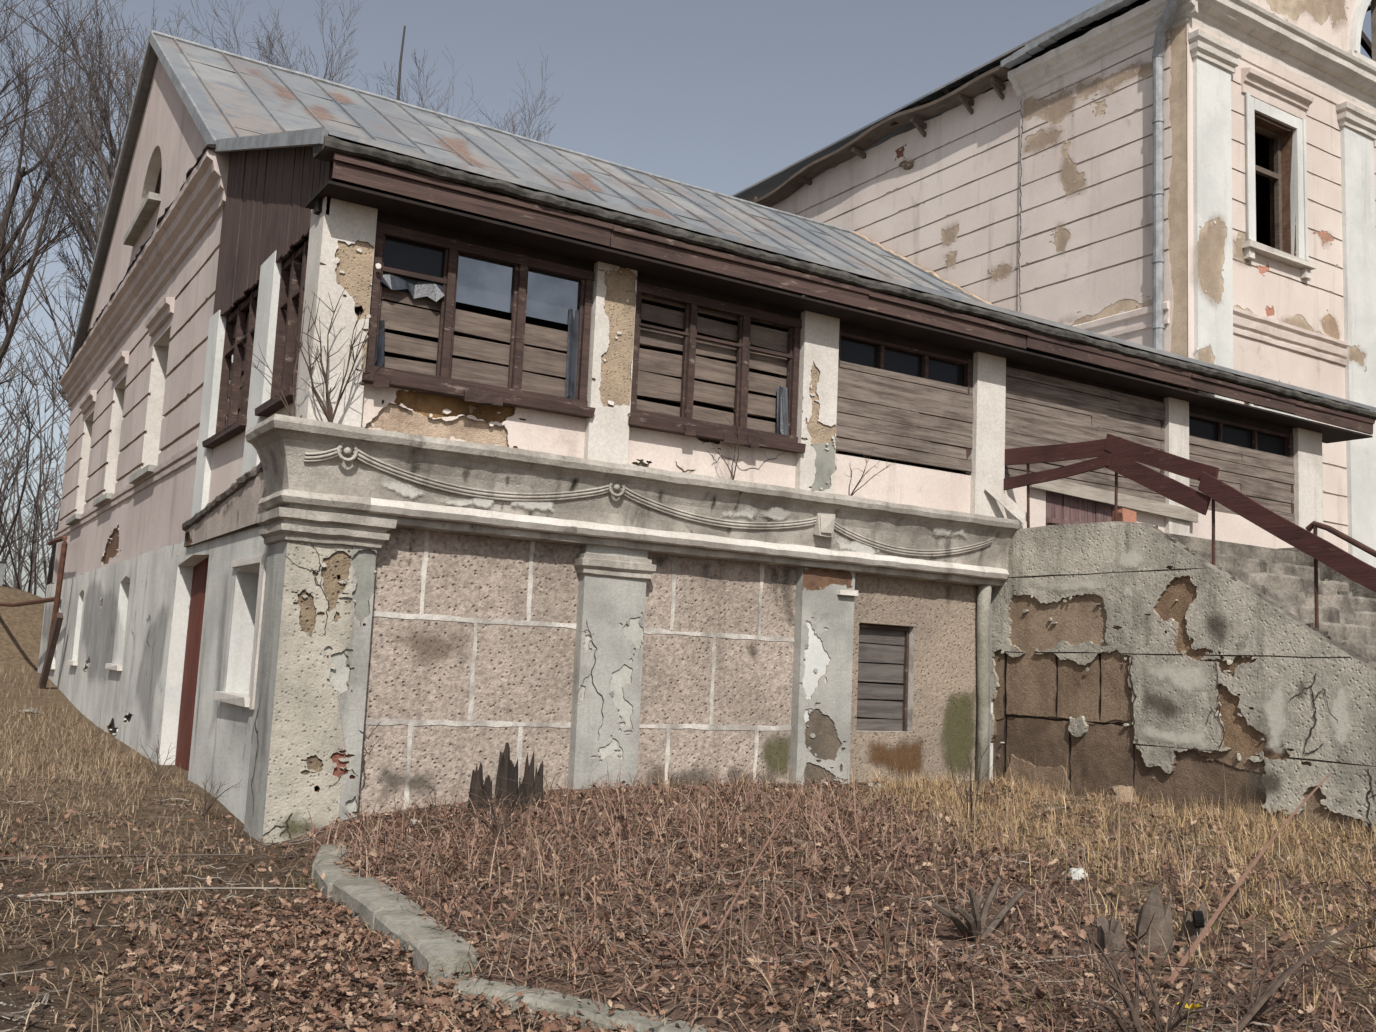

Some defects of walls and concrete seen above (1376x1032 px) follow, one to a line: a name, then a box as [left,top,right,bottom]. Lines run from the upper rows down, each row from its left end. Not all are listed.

peeling [1023,54,1153,196]
spalling [320,240,381,386]
peeling [1196,217,1367,372]
spalling [365,389,526,448]
spalling [801,361,839,491]
spalling [101,523,121,565]
spalling [292,549,377,637]
crack [577,621,604,735]
spalling [799,617,847,784]
spalling [991,565,1376,838]
crack [1288,673,1338,756]
spalling [300,750,358,818]